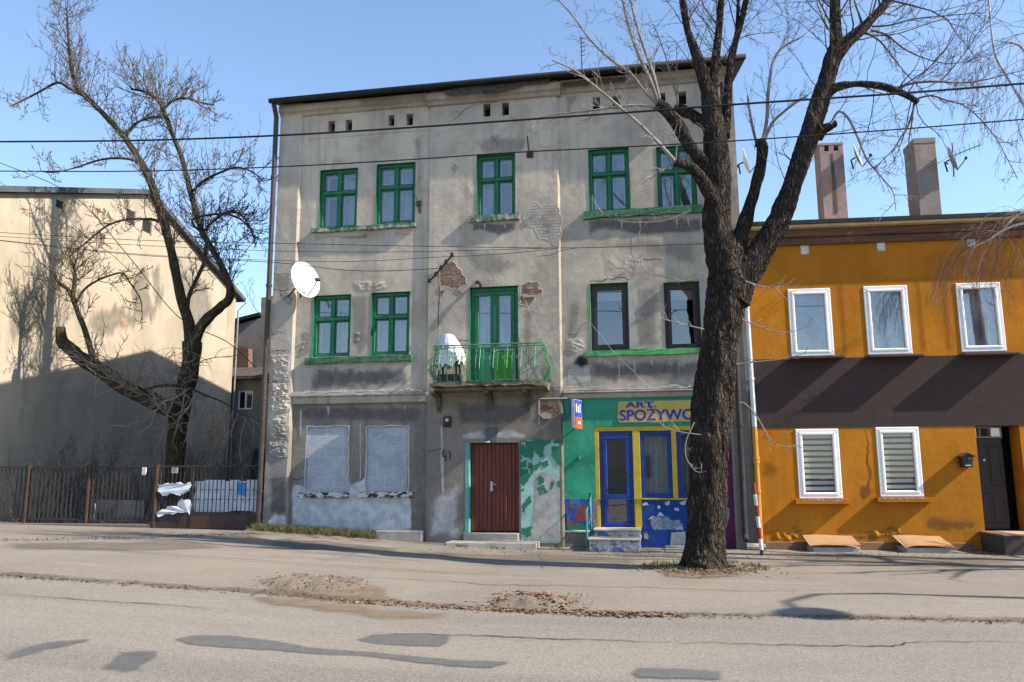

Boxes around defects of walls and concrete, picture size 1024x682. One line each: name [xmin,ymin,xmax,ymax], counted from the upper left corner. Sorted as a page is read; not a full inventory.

spalling [523,202,563,247]
water stain [590,217,700,233]
spalling [438,261,470,293]
spalling [519,281,543,307]
spalling [536,366,561,423]
crack [864,430,872,487]
peeling [642,500,686,546]